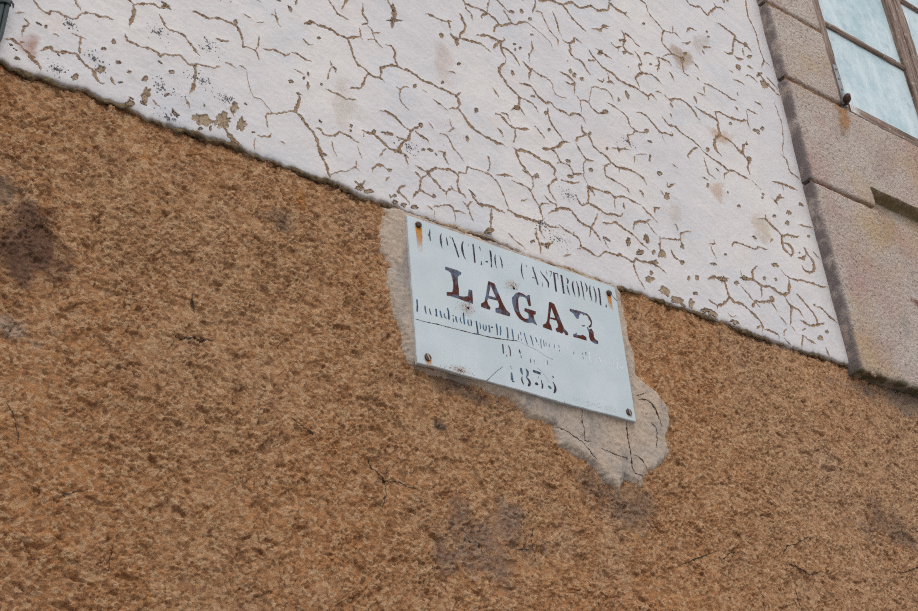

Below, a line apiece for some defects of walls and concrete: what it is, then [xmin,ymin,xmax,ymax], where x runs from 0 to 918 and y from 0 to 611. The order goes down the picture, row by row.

spalling [125,75,151,106]
spalling [191,102,255,133]
crack [5,0,835,355]
spalling [626,234,718,317]
crack [417,319,551,383]
crack [555,392,661,482]